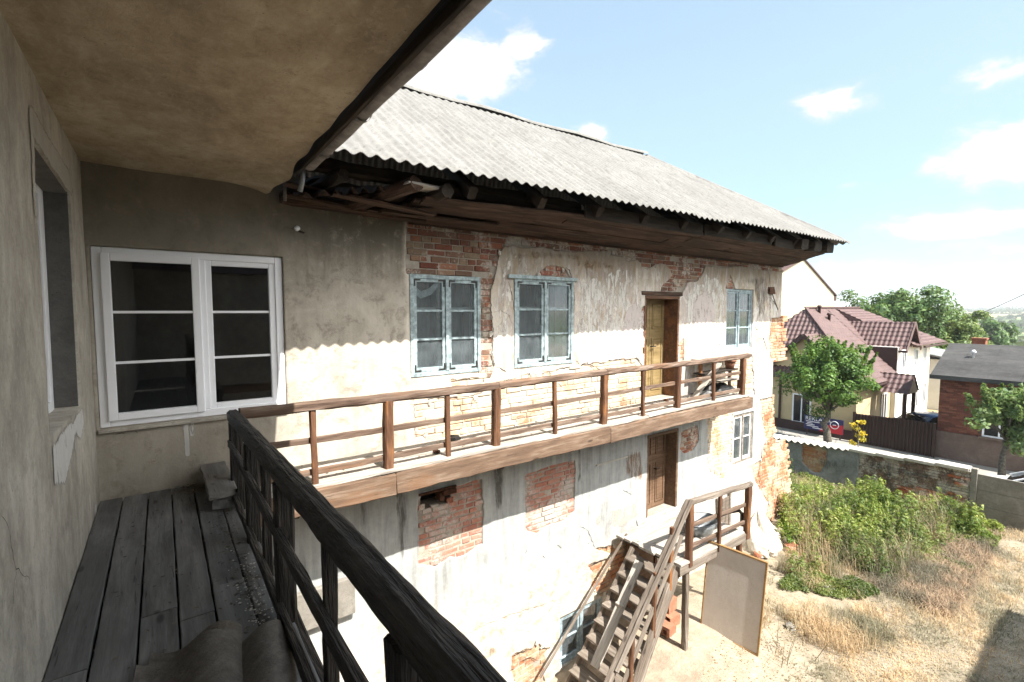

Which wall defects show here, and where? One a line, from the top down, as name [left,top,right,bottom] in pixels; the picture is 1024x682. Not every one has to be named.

flaking render [405,222,783,443]
flaking render [769,316,788,362]
flaking render [417,479,483,567]
flaking render [525,461,575,533]
flaking render [680,413,733,481]
flaking render [695,351,827,522]
flaking render [858,453,978,510]
flaking render [511,640,549,682]